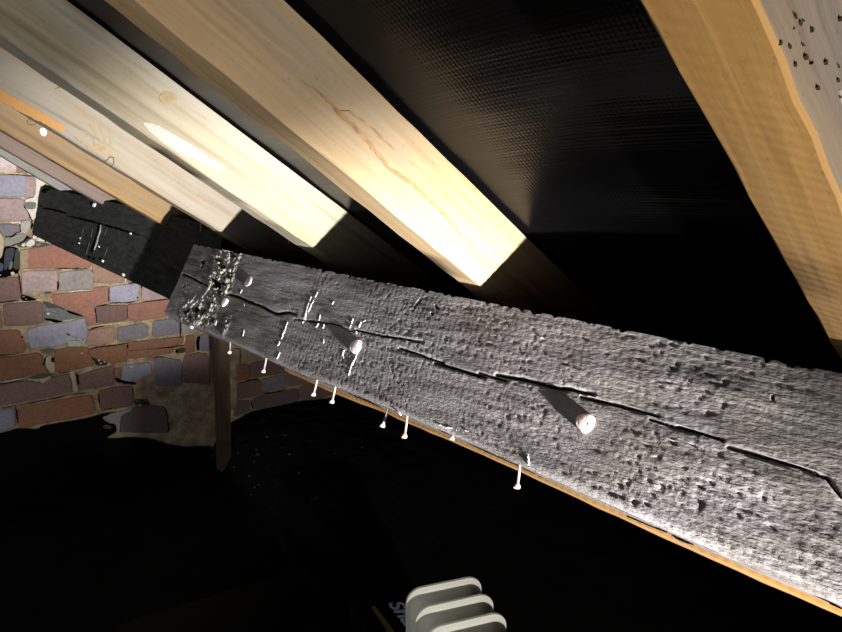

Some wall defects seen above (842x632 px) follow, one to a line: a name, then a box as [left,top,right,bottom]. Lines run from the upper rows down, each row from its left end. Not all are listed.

leakage [778,40,840,68]
crack [230,295,842,498]
crack [626,515,694,545]